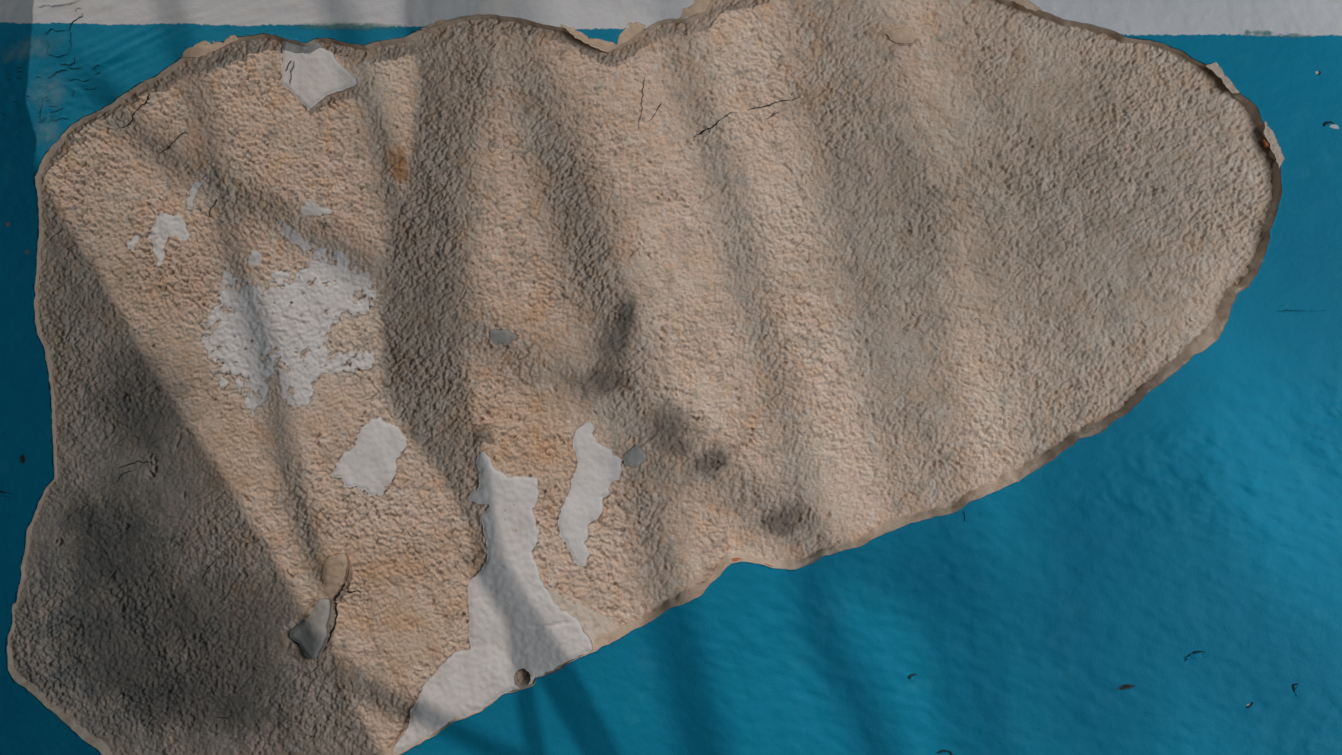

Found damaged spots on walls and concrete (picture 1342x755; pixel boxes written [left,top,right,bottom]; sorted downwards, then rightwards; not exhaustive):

crack [35,0,101,121]
flaking render [281,41,359,111]
flaking render [223,15,574,50]
flaking render [995,0,1208,69]
flaking render [1229,91,1285,170]
flaking render [201,247,377,415]
flaking render [7,57,191,755]
flaking render [543,147,1282,676]
flaking render [332,415,408,496]
flaking render [290,598,333,660]
flaking render [322,553,350,597]
flaking render [394,452,593,752]